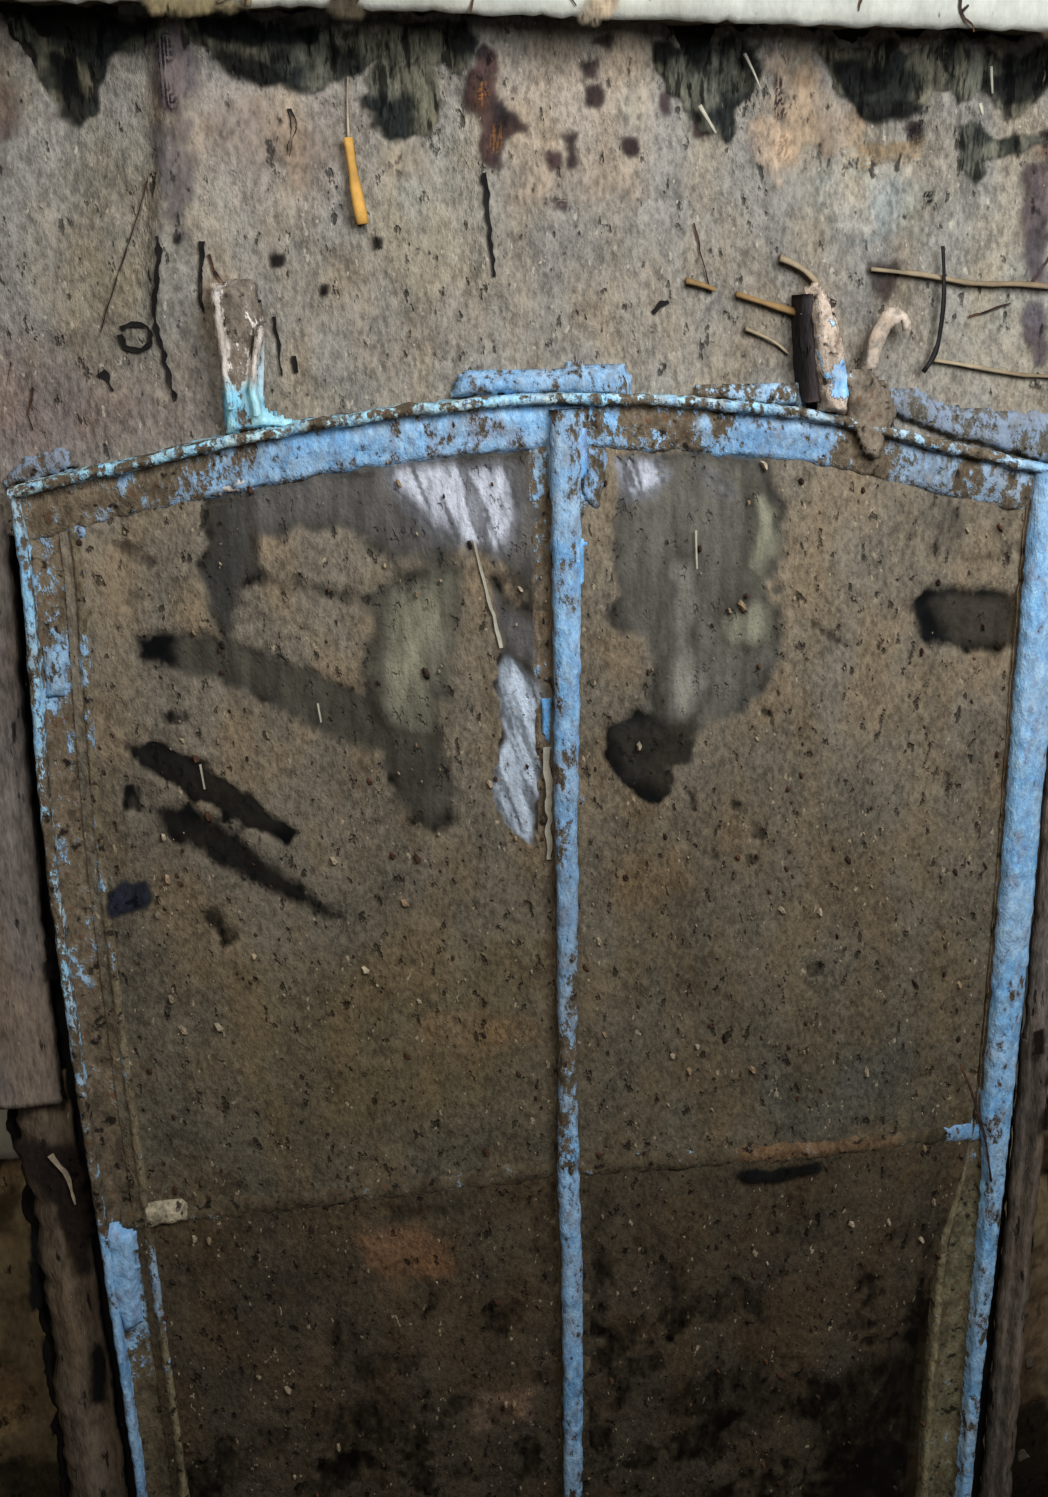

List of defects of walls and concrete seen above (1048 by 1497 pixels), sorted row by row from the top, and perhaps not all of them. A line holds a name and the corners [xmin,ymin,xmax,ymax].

rust [463,44,527,170]
spalling [44,936,60,981]
spalling [58,1004,68,1032]
spalling [65,1064,77,1099]